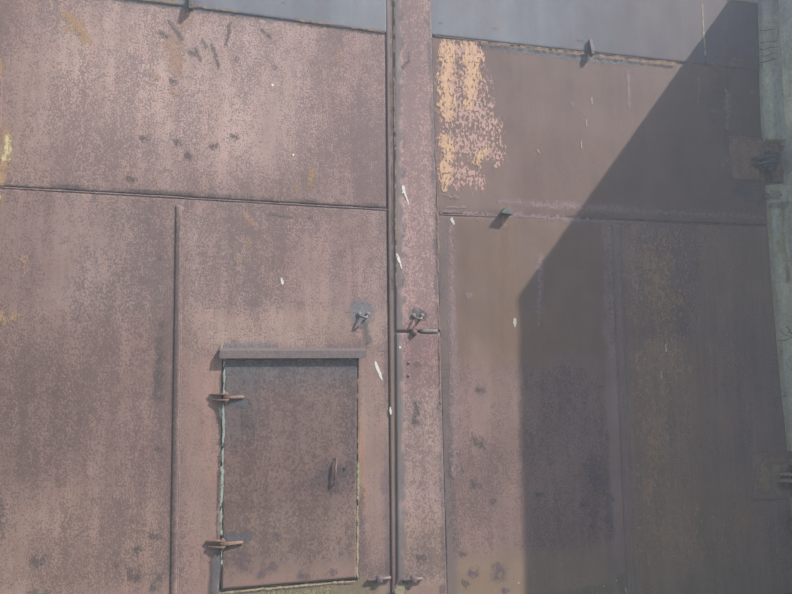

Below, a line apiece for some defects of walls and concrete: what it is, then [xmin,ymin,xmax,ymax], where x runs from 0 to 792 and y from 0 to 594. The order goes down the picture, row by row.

rust [0,123,13,185]
peeling [434,39,509,194]